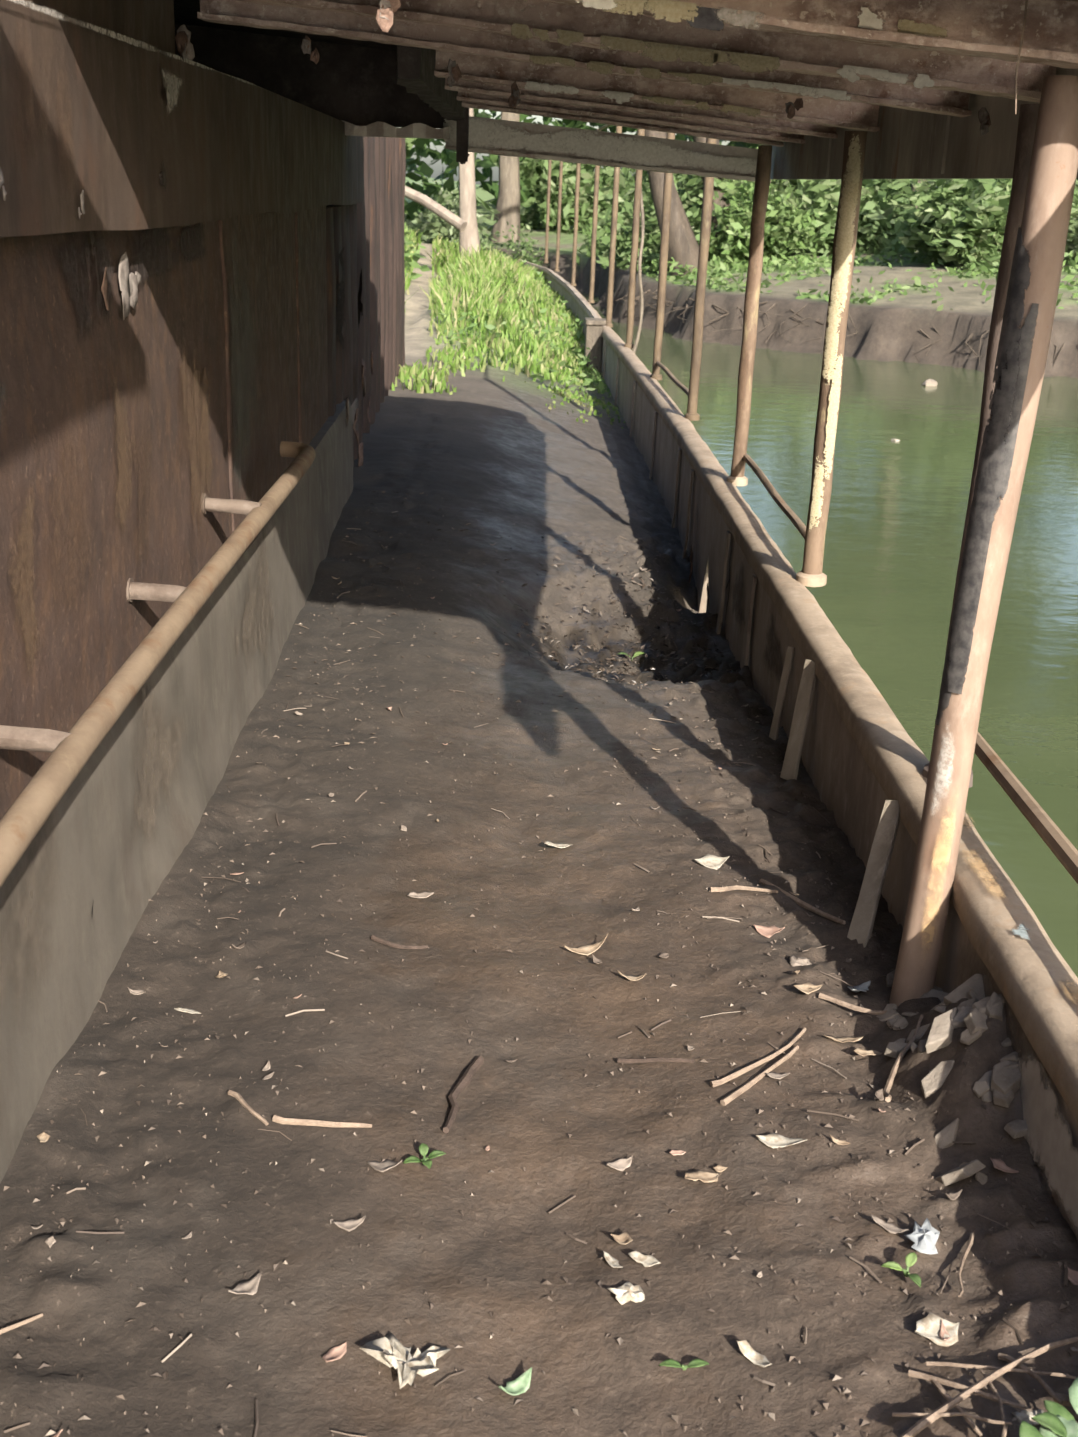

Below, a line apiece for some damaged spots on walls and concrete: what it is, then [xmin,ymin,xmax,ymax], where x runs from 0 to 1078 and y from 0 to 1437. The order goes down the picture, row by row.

corrosion [175,24,195,61]
corrosion [301,35,319,64]
peeling [857,7,947,38]
peeling [101,252,142,320]
corrosion [115,389,131,525]
corrosion [13,498,37,669]
corrosion [933,738,954,808]
corrosion [933,816,972,870]
corrosion [970,858,1002,894]
corrosion [924,901,938,943]